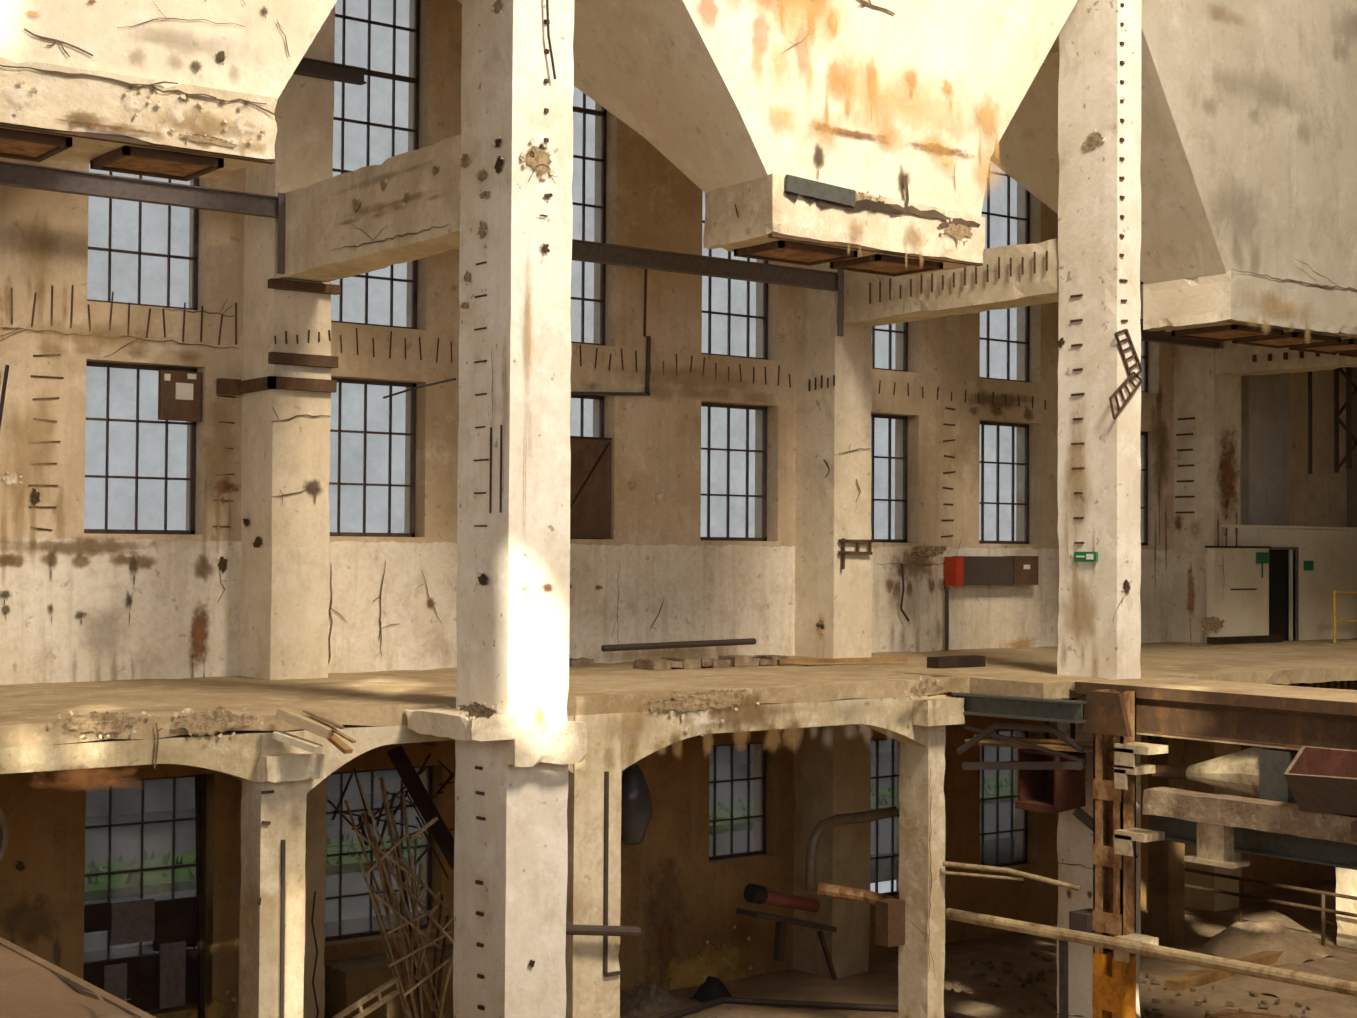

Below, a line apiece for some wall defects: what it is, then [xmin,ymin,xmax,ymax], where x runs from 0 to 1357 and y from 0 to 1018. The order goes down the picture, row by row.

crack [117,0,290,57]
crack [0,28,281,118]
corrosion [817,65,884,140]
corrosion [913,104,999,164]
spalling [461,136,504,199]
spalling [520,138,555,218]
spalling [785,174,903,214]
crack [332,224,449,250]
corrosion [1217,431,1239,546]
corrosion [190,609,208,678]
spalling [174,706,265,737]
spalling [638,688,759,736]